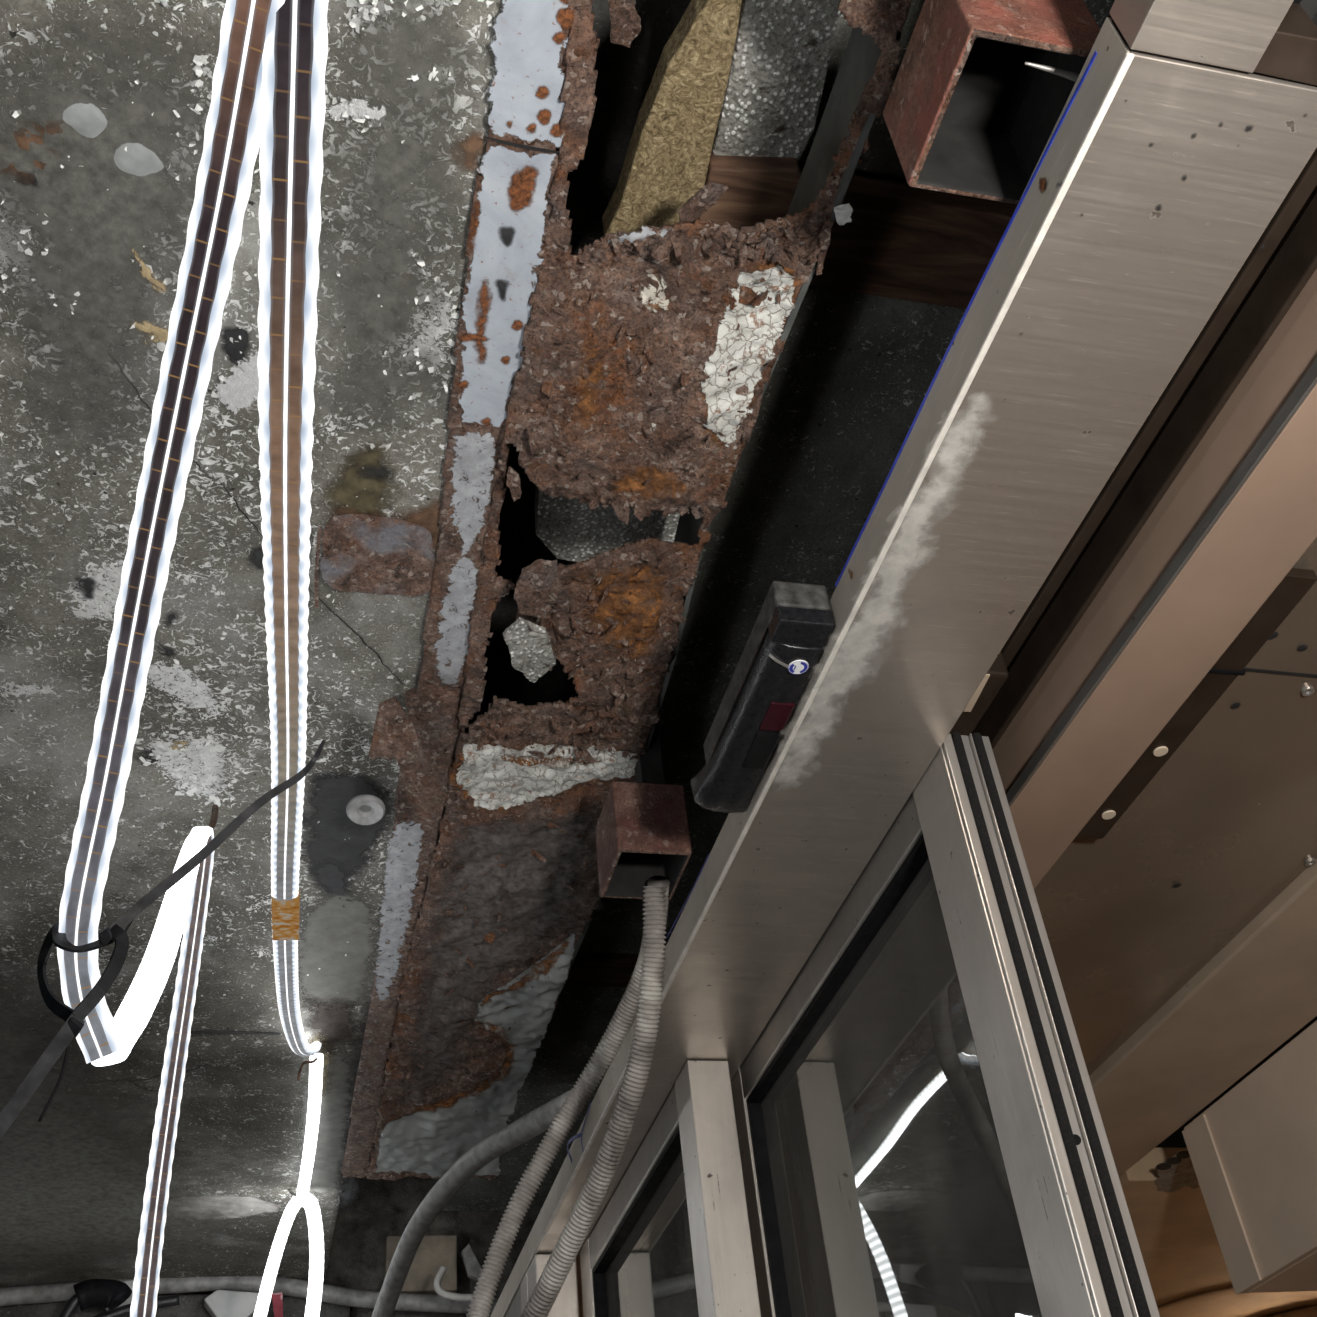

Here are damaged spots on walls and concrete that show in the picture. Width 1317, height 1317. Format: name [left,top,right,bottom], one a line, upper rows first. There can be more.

rust [552,0,574,44]
rust [608,0,641,48]
rust [507,86,564,137]
rust [508,166,538,211]
peeling [608,226,672,244]
rust [558,182,853,280]
rust [460,281,510,364]
rust [677,276,781,330]
rust [527,292,759,528]
rust [506,466,522,501]
leakage [773,394,988,786]
rust [477,549,686,764]